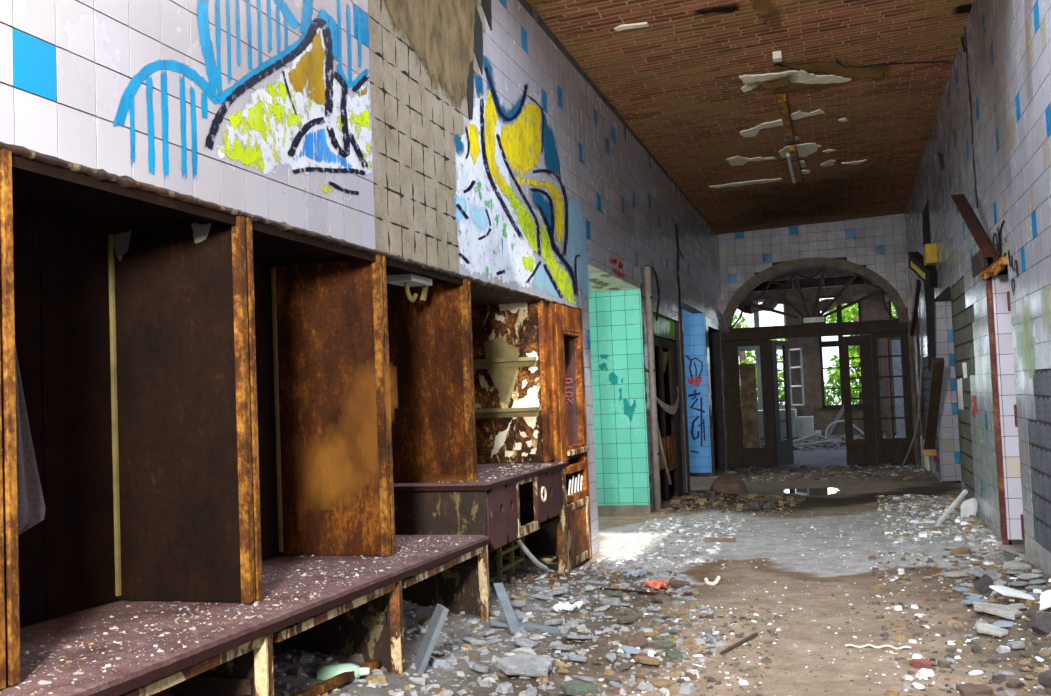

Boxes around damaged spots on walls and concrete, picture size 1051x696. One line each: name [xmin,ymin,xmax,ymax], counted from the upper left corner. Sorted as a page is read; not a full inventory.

peeling [739,70,852,92]
spalling [367,0,485,274]
peeling [740,109,825,137]
peeling [726,143,867,174]
peeling [709,178,782,189]
peeling [495,302,527,322]
peeling [485,336,540,458]